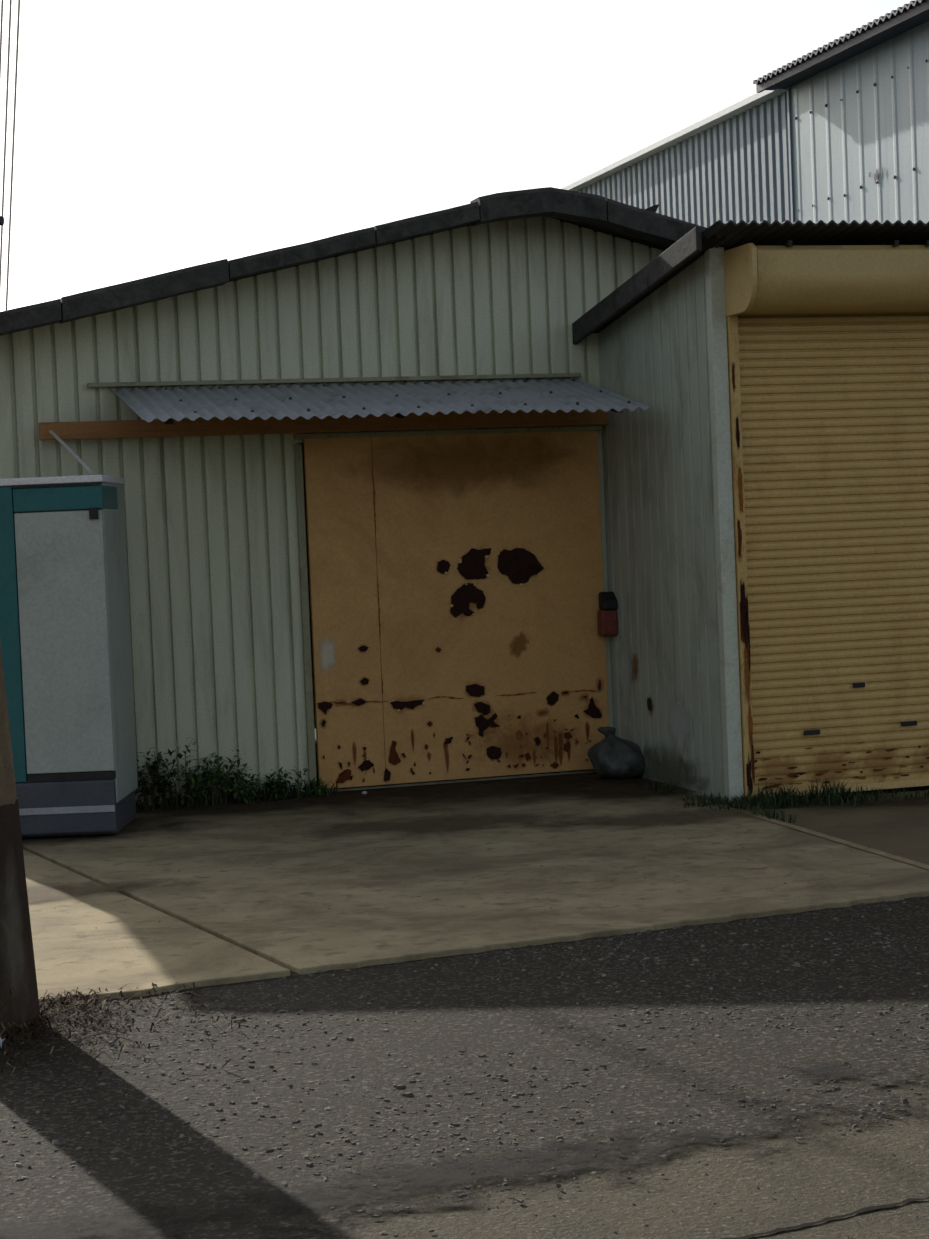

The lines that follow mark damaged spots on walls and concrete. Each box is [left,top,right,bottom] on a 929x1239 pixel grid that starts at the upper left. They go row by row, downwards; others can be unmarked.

rust [317,677,602,783]
rust [740,579,929,800]
crack [721,1196,929,1239]